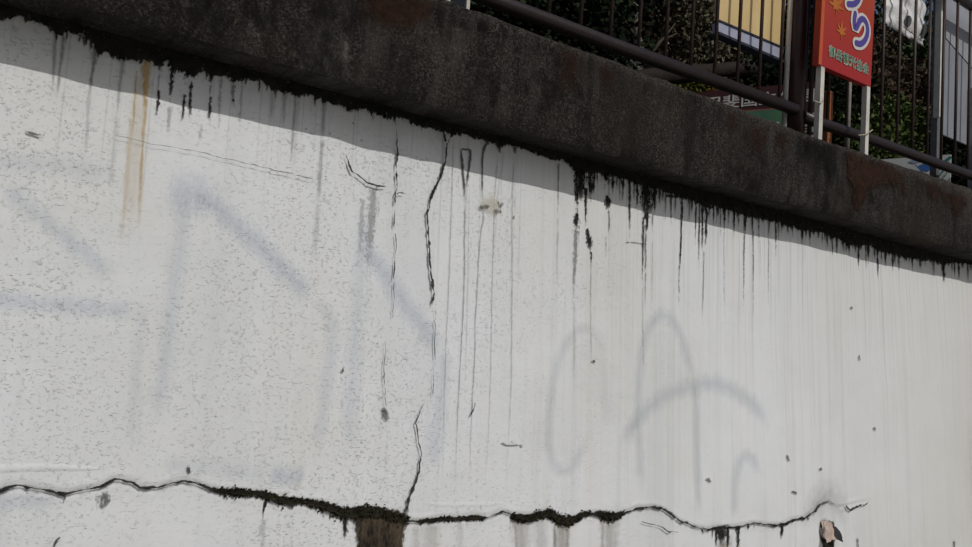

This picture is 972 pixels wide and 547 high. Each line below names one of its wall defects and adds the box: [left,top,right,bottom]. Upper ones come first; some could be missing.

leakage [0,3,972,287]
crack [0,123,867,533]
leakage [342,509,408,547]